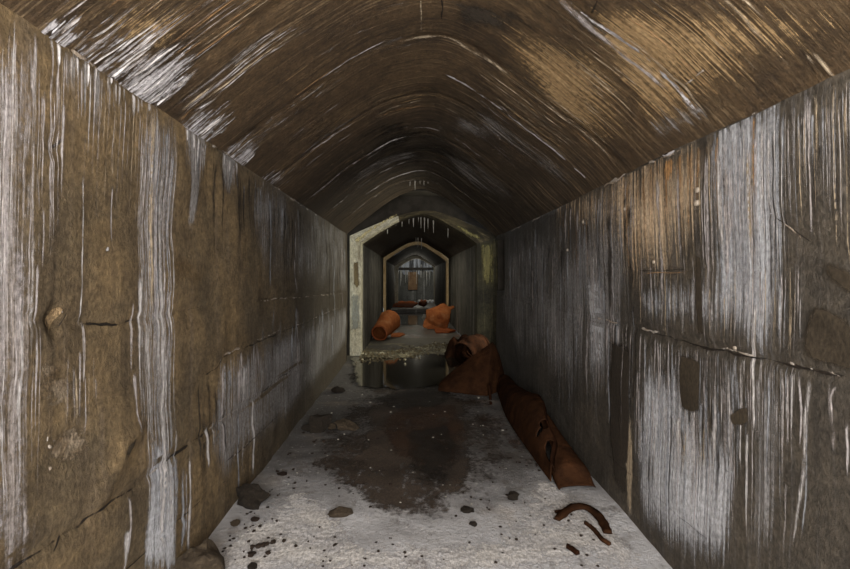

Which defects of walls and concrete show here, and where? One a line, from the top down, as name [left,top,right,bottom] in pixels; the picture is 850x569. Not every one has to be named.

water stain [280,43,381,100]
crack [85,318,132,326]
water stain [0,0,261,569]
water stain [185,30,360,487]
water stain [503,85,850,559]
crack [641,327,844,376]
crack [150,370,291,474]
water stain [312,385,509,516]
crack [9,489,131,569]